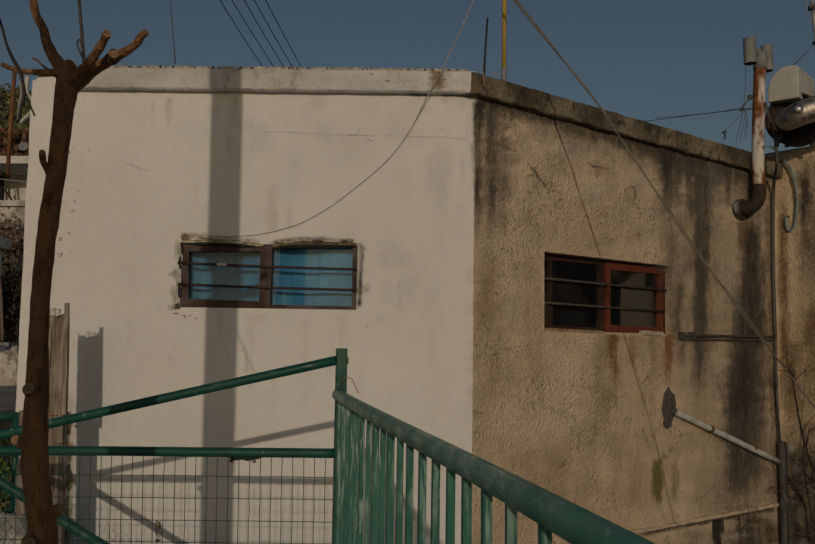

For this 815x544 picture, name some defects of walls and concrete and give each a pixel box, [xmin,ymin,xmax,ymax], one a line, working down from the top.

water stain [474,98,752,376]
water stain [653,461,663,499]
water stain [728,215,767,488]